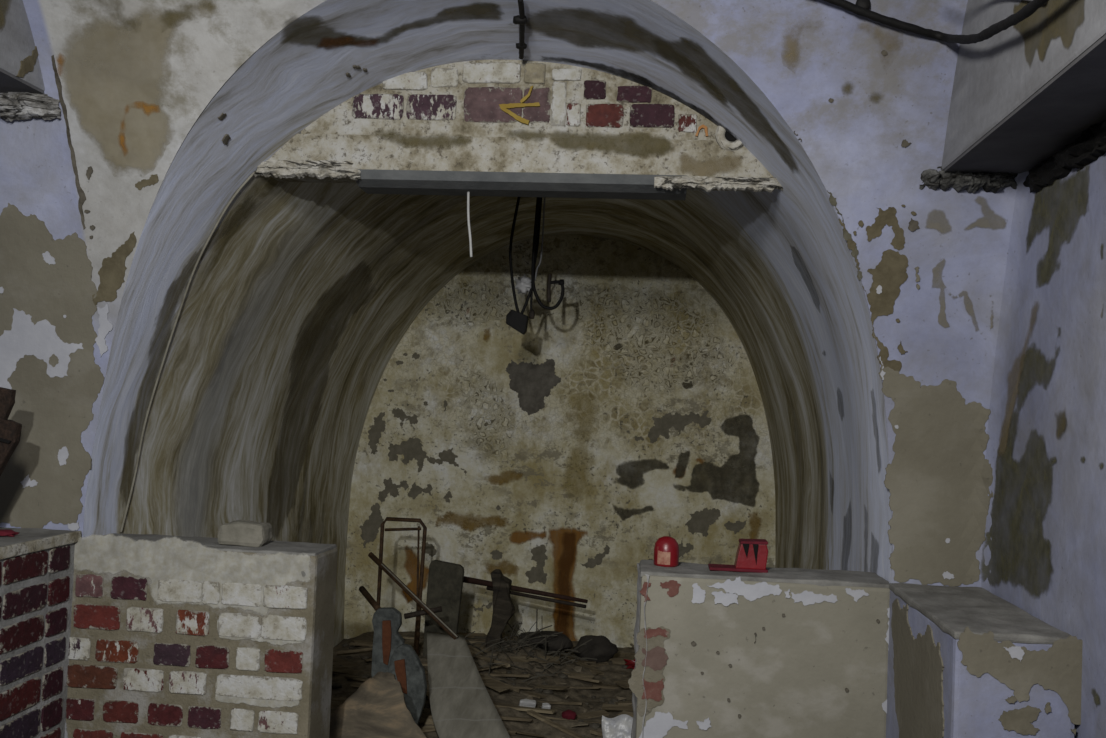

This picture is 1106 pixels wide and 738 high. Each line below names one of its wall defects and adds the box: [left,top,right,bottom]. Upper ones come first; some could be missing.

leakage [283,3,501,49]
spalling [0,92,61,122]
spalling [919,120,1106,193]
peeling [0,203,137,531]
flaking render [505,359,561,415]
peeling [827,191,993,586]
peeling [359,408,467,548]
corrosion [436,513,587,641]
peeling [678,508,747,558]
flaking render [628,626,671,716]
peeling [876,598,945,738]
peeling [957,626,1083,736]